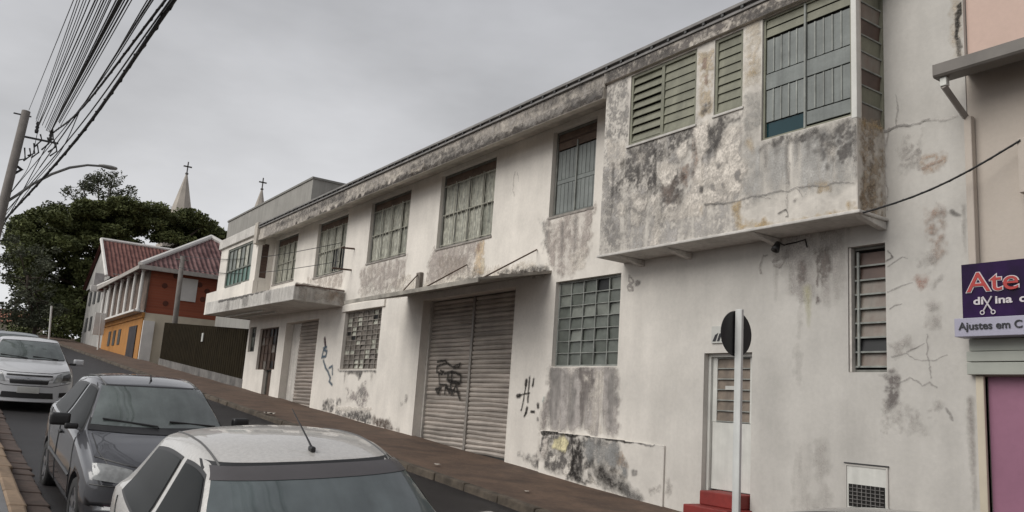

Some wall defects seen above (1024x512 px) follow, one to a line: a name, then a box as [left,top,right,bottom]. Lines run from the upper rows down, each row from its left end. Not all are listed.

damp [263,0,855,276]
crack [704,171,854,206]
crack [884,105,941,204]
damp [786,231,844,302]
damp [322,370,392,430]
damp [526,367,639,500]